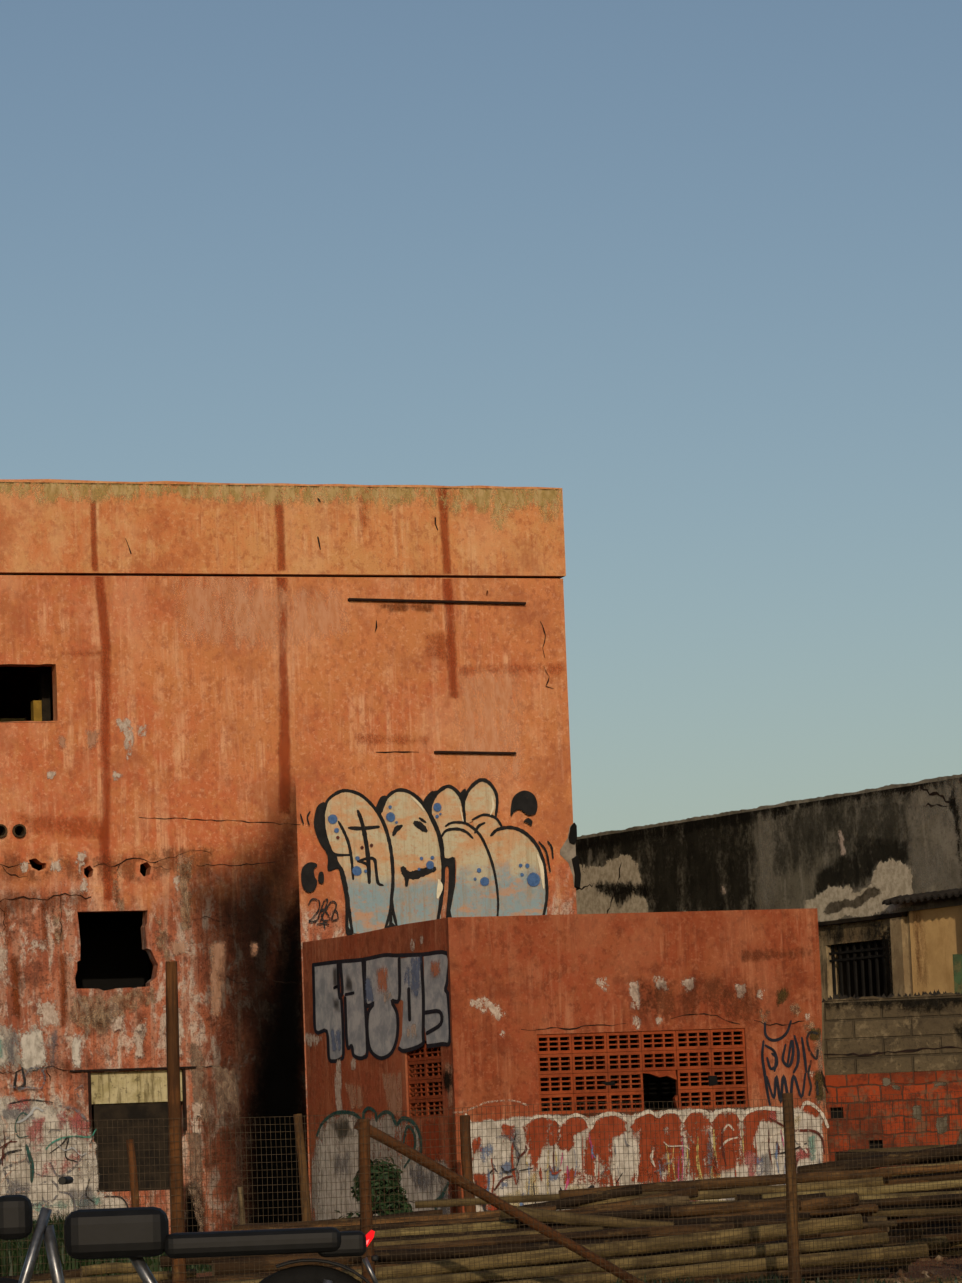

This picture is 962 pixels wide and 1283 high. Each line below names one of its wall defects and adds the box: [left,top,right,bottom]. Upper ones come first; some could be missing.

crack [0,817,300,942]
peeling [560,823,649,914]
damp [575,777,962,912]
peeling [804,858,914,922]
peeling [31,909,63,952]
damp [210,943,224,1016]
peeling [470,997,506,1036]
peeling [629,976,694,1029]
peeling [735,983,767,1022]
peeling [36,988,239,1232]